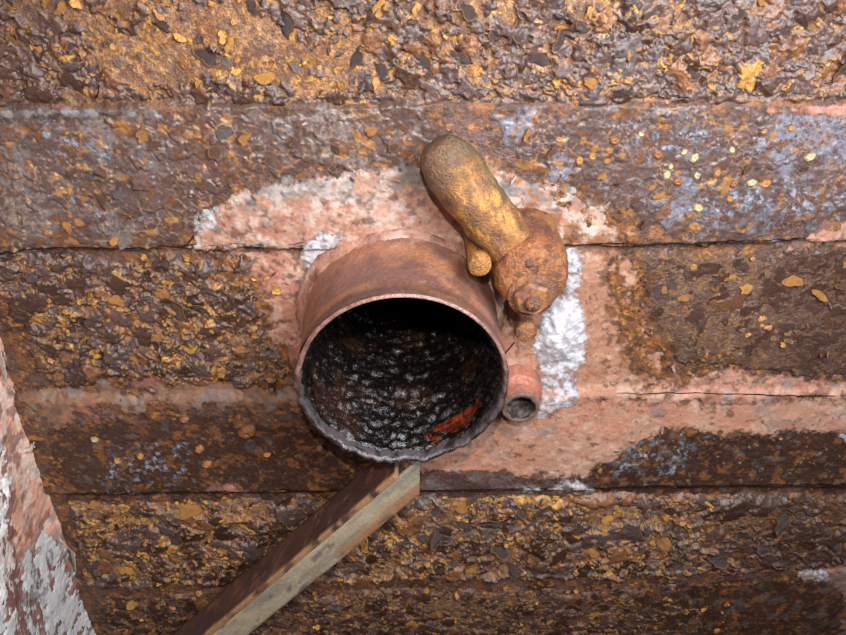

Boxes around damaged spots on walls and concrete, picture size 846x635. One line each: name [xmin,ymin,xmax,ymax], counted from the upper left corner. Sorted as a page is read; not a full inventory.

peeling [136,128,161,150]
peeling [216,125,252,147]
peeling [187,163,466,370]
corrosion [426,398,482,442]
peeling [0,337,303,635]
peeling [807,560,846,603]